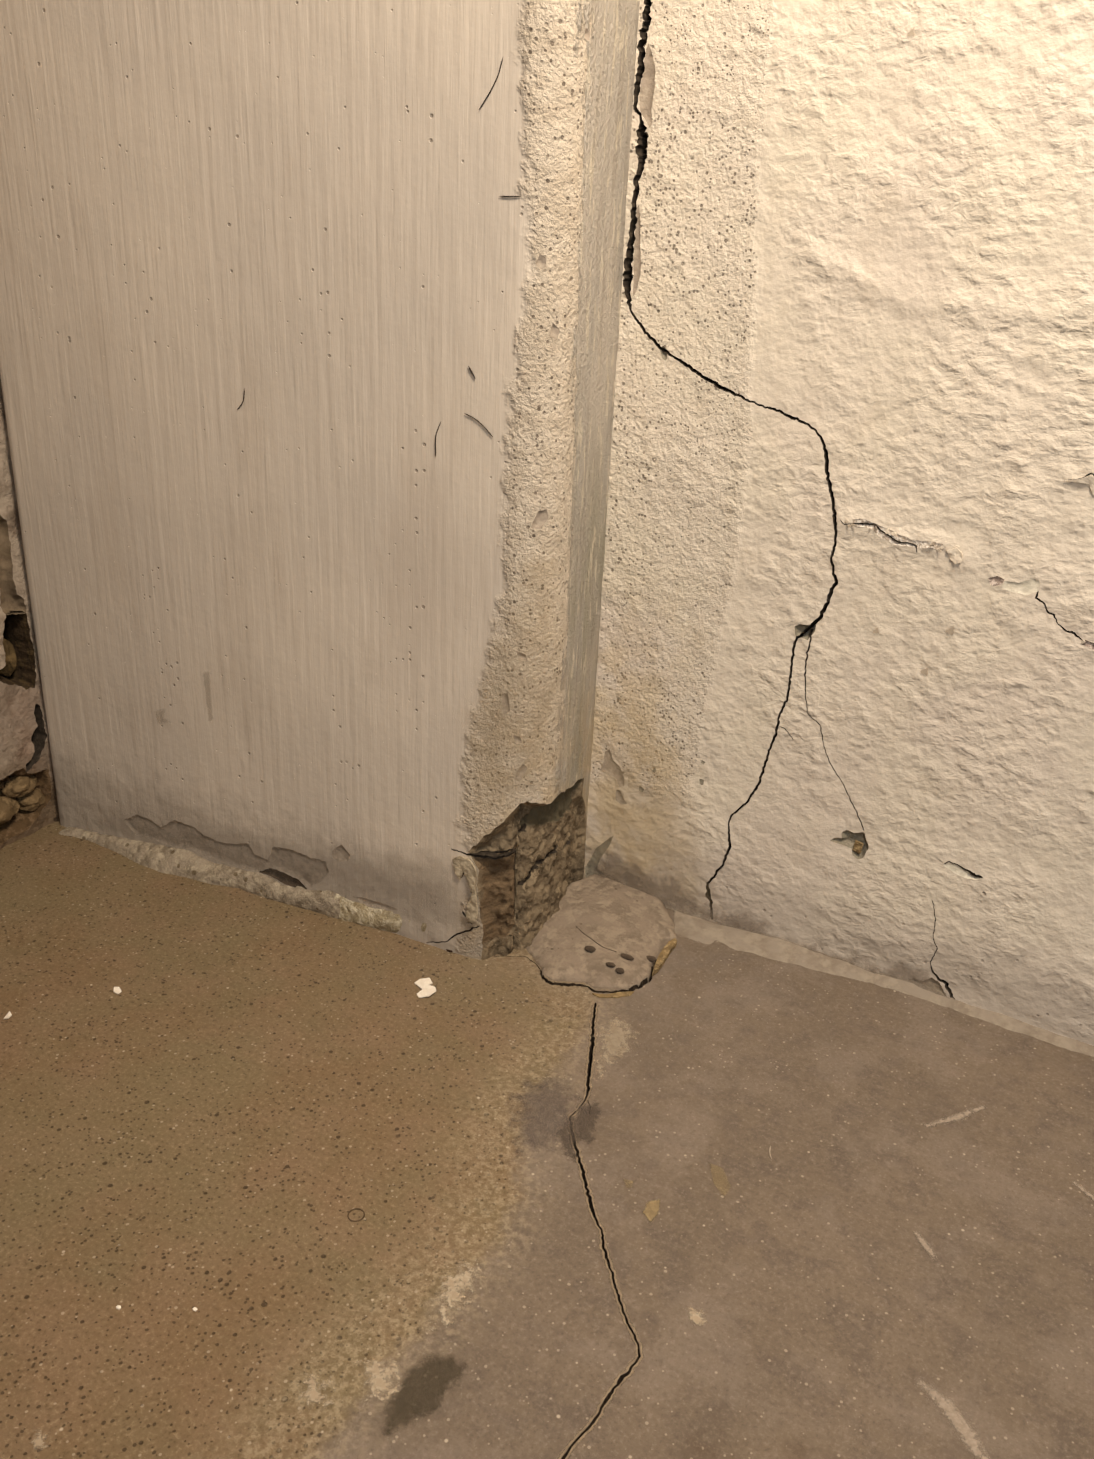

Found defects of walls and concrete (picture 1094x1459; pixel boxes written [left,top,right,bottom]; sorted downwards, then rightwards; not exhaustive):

crack [623,0,1094,920]
spalling [0,515,37,690]
spalling [0,768,51,846]
peeling [124,815,350,889]
spalling [452,778,613,960]
peeling [600,749,644,805]
crack [426,926,657,1459]
damp [366,1357,461,1435]